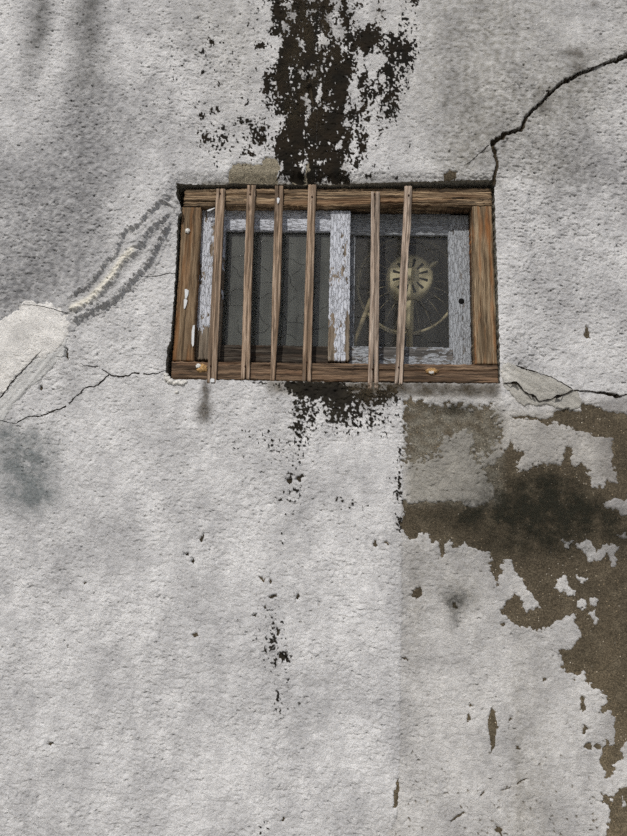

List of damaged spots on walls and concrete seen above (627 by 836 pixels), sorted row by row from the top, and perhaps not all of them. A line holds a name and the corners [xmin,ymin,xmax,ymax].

damp [190,0,421,185]
crack [467,53,627,186]
crack [0,350,42,398]
crack [0,363,167,424]
crack [505,365,627,402]
damp [229,381,406,505]
damp [442,473,622,552]
peeling [399,396,627,779]
peeling [601,787,627,836]